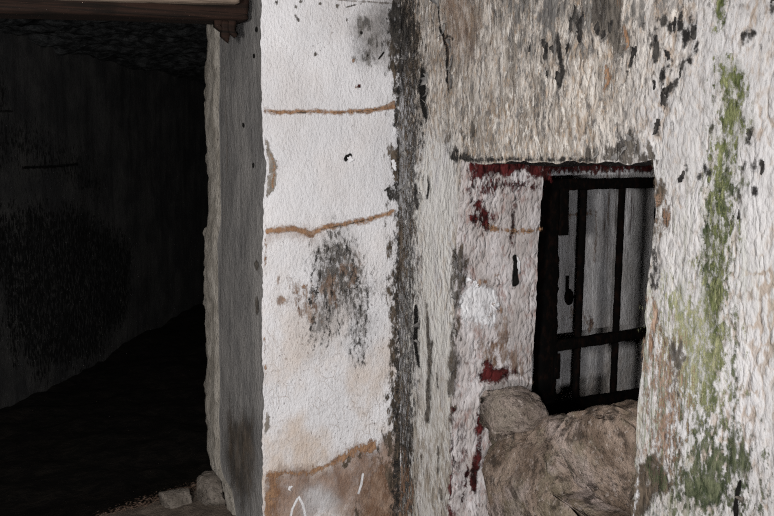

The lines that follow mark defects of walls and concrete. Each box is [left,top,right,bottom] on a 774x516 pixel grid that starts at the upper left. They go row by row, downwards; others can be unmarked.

leakage [494,0,699,109]
leakage [444,119,661,165]
leakage [264,0,426,516]
leakage [696,53,764,428]
peeling [288,486,331,516]
leakage [664,454,681,516]